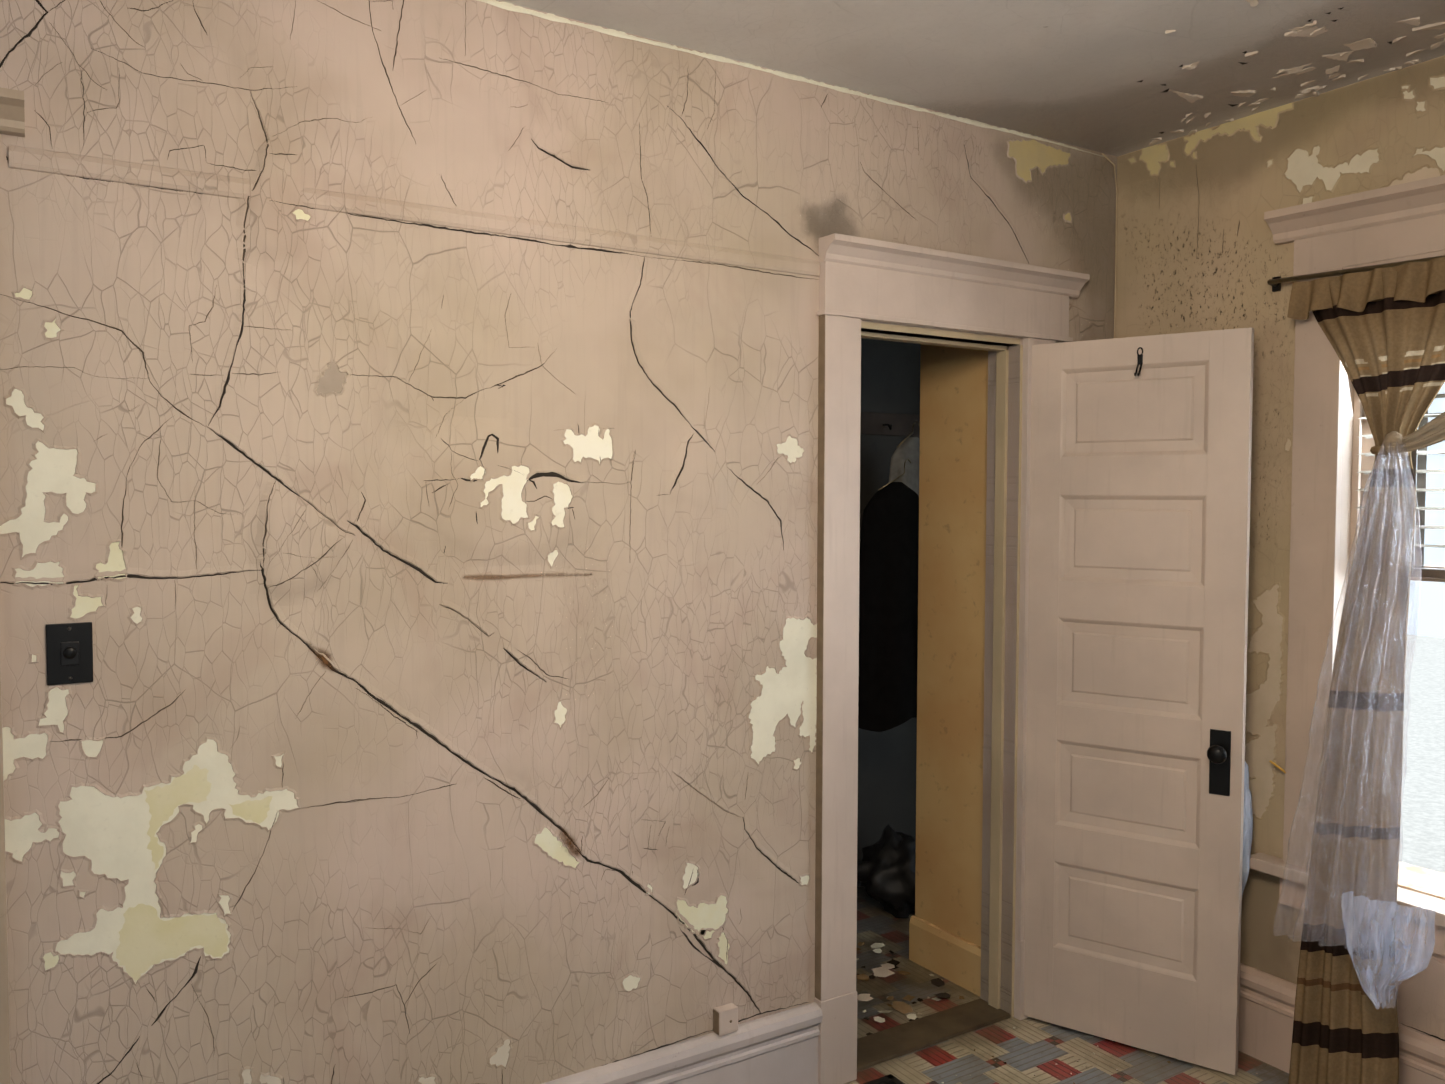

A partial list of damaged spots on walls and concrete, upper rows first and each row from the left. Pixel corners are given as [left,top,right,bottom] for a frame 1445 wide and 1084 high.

peeling [476,0,1104,184]
crack [964,143,1032,263]
peeling [1127,17,1445,177]
peeling [1265,143,1445,205]
peeling [0,385,129,622]
crack [0,0,819,1084]
peeling [467,463,575,533]
peeling [561,423,615,466]
peeling [747,615,817,771]
peeling [5,736,301,986]
peeling [532,825,582,870]
peeling [673,861,732,966]